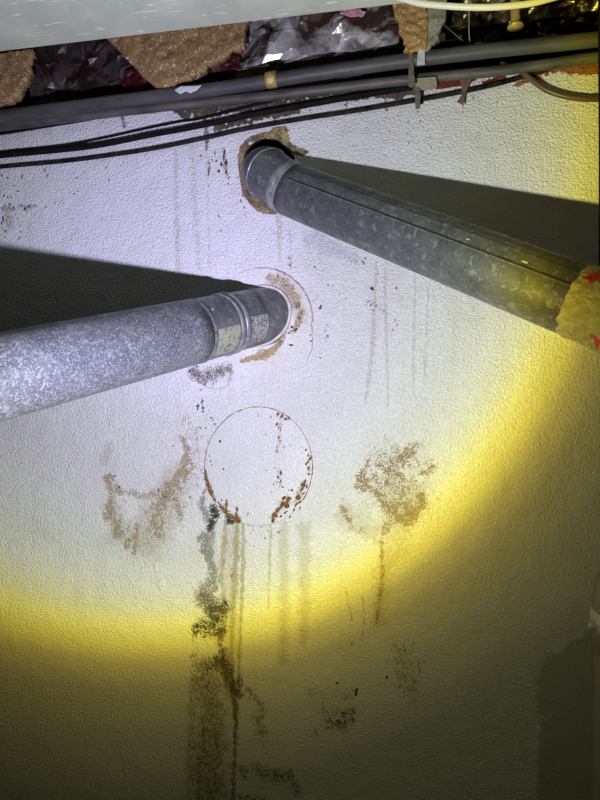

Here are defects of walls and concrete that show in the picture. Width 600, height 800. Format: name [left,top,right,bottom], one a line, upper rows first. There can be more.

rust [240,323,290,363]
rust [204,455,249,524]
rust [265,449,312,523]
leakage [102,416,300,800]